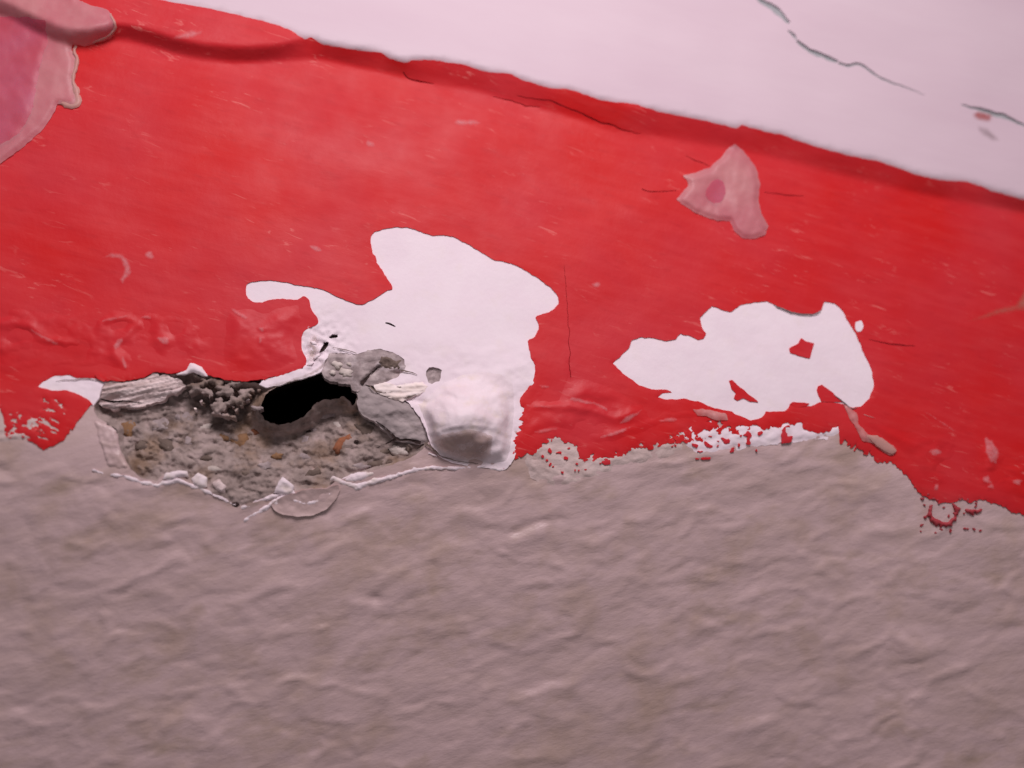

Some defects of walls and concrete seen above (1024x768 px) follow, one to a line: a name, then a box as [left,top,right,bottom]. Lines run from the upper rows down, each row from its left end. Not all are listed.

crack [757,0,923,95]
crack [961,105,1024,126]
flaking render [0,227,874,522]